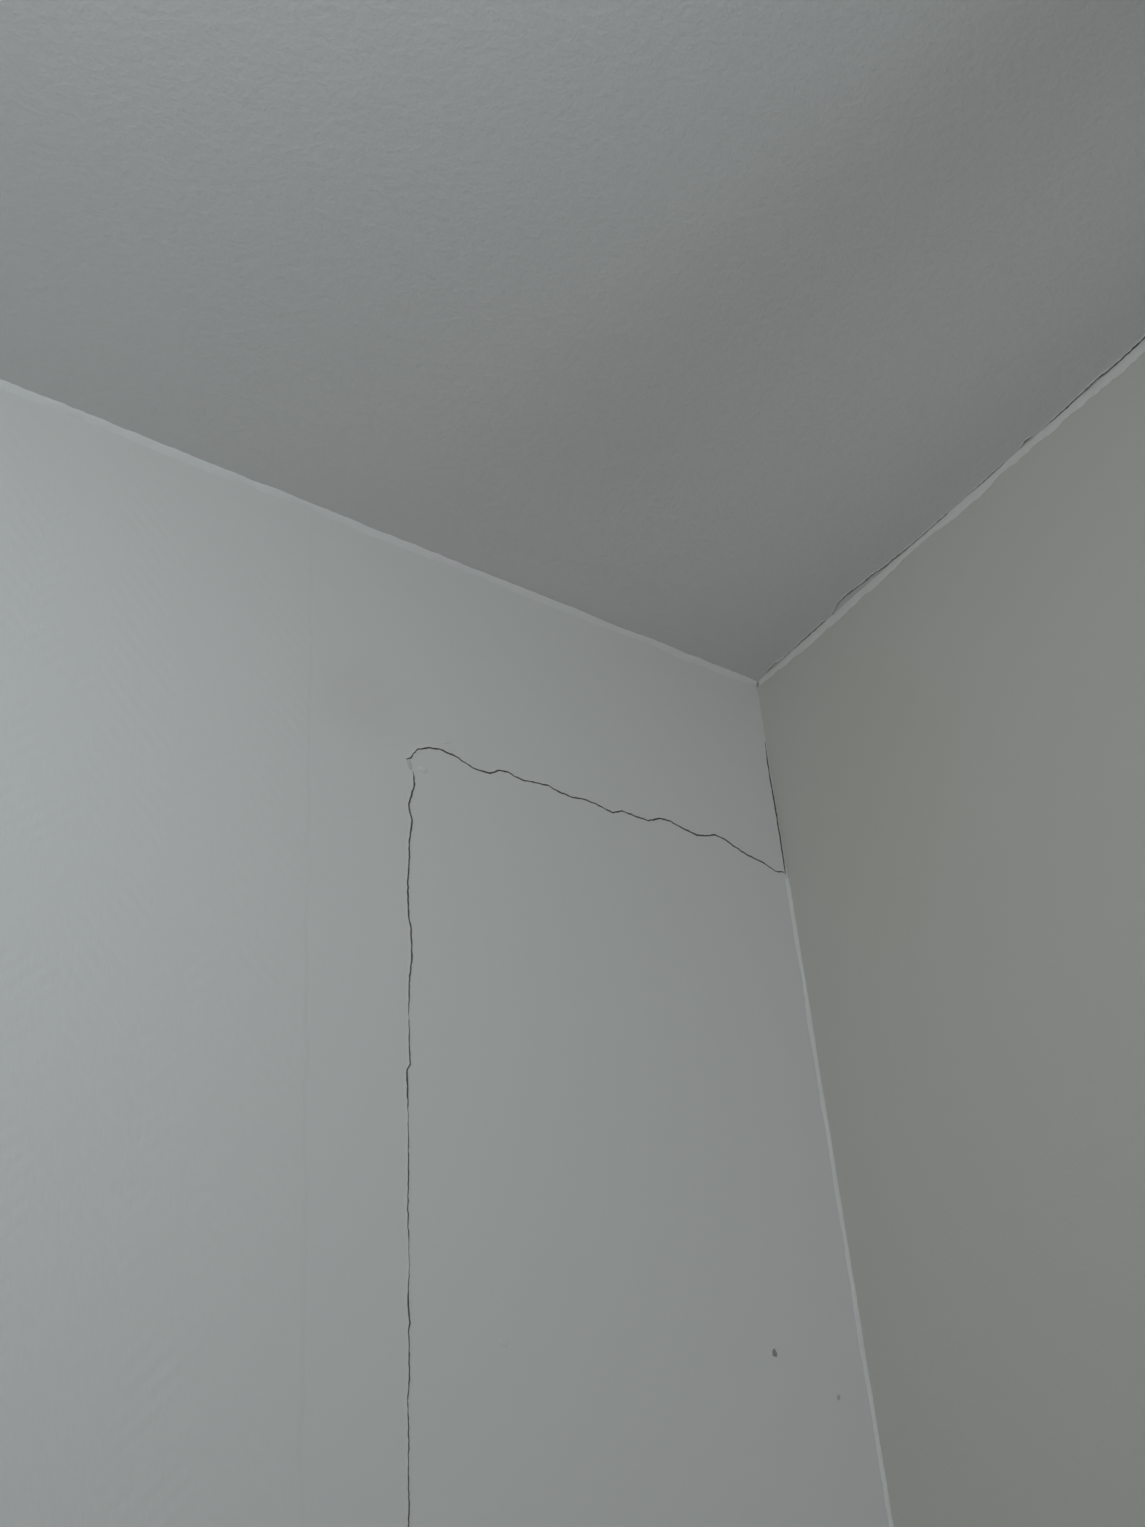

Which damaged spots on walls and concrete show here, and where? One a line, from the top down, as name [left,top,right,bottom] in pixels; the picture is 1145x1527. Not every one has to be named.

crack [403,740,786,1527]